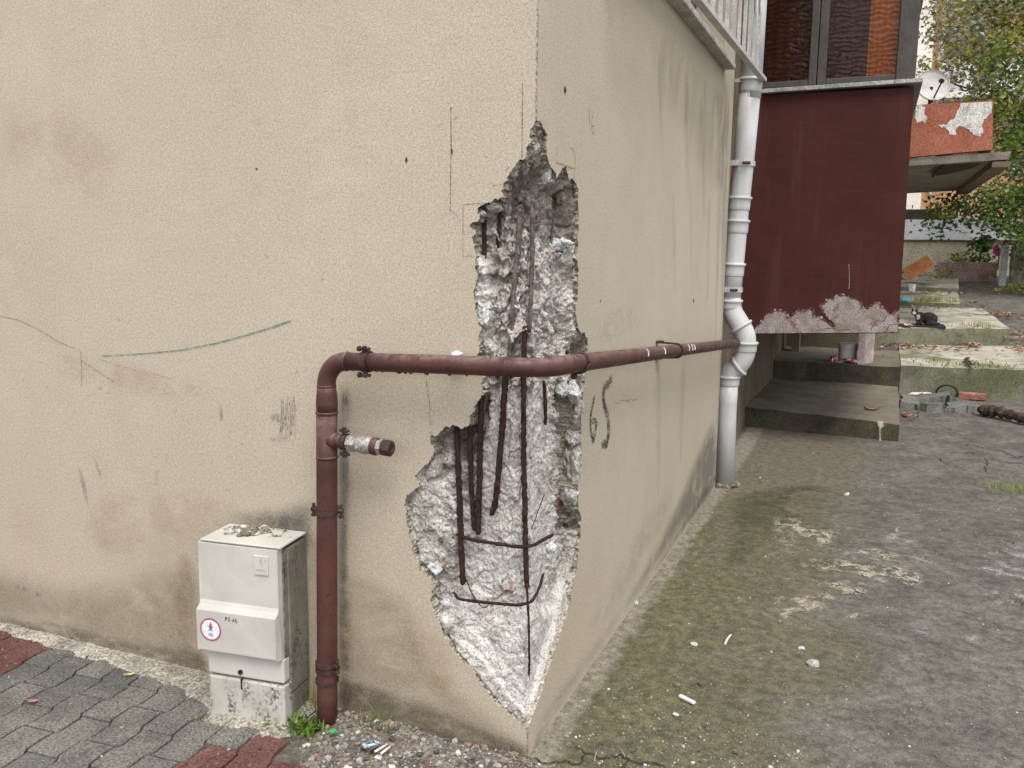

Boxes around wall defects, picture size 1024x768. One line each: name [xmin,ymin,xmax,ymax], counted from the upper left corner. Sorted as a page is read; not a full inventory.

peeling [915,102,992,137]
spalling [470,120,588,358]
peeling [755,293,900,333]
spalling [404,373,585,730]